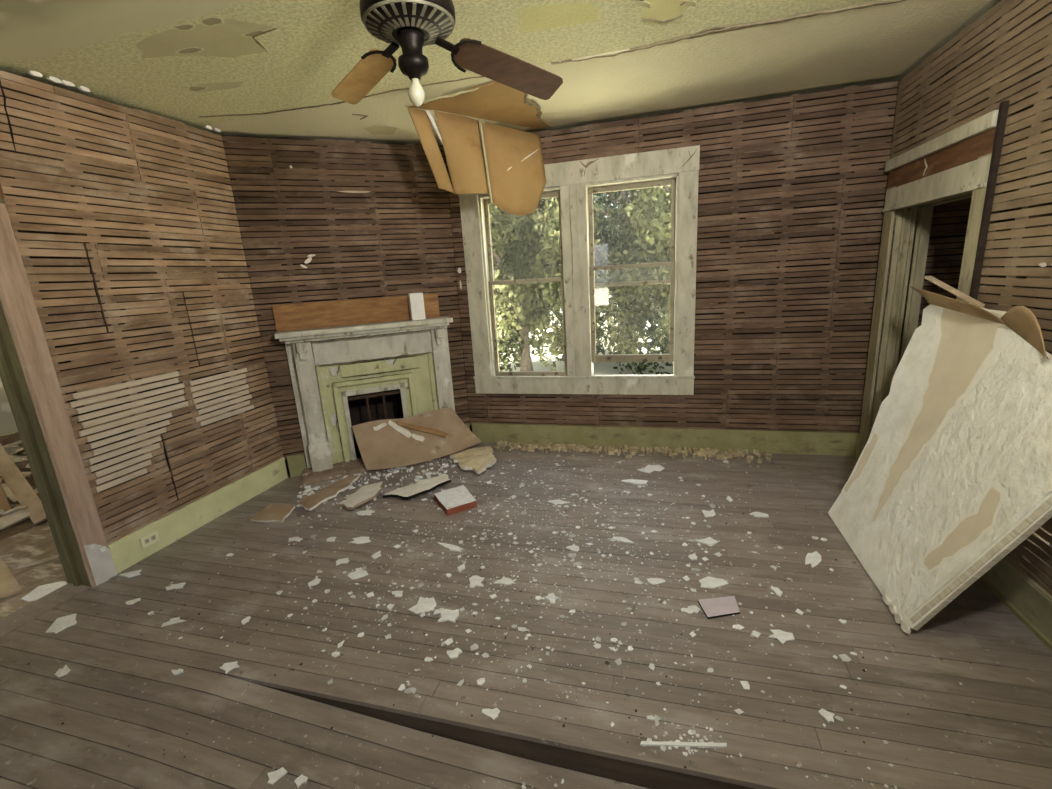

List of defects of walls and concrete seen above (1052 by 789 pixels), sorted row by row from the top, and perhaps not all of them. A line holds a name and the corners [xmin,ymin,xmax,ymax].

peeling [129,16,278,60]
crack [551,0,906,64]
crack [199,76,484,118]
peeling [870,306,1006,525]
peeling [841,430,880,497]
peeling [920,482,1008,573]
spalling [882,595,911,634]